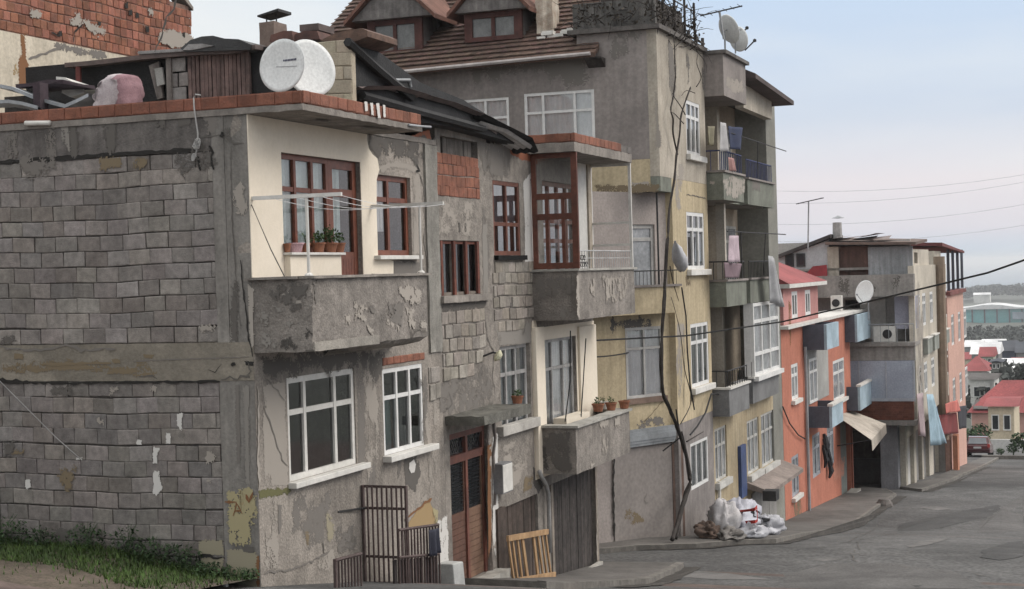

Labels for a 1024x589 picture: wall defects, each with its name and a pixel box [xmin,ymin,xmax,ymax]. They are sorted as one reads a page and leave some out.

flaking render [437,152,480,199]
crack [0,132,288,489]
spalling [409,498,449,563]